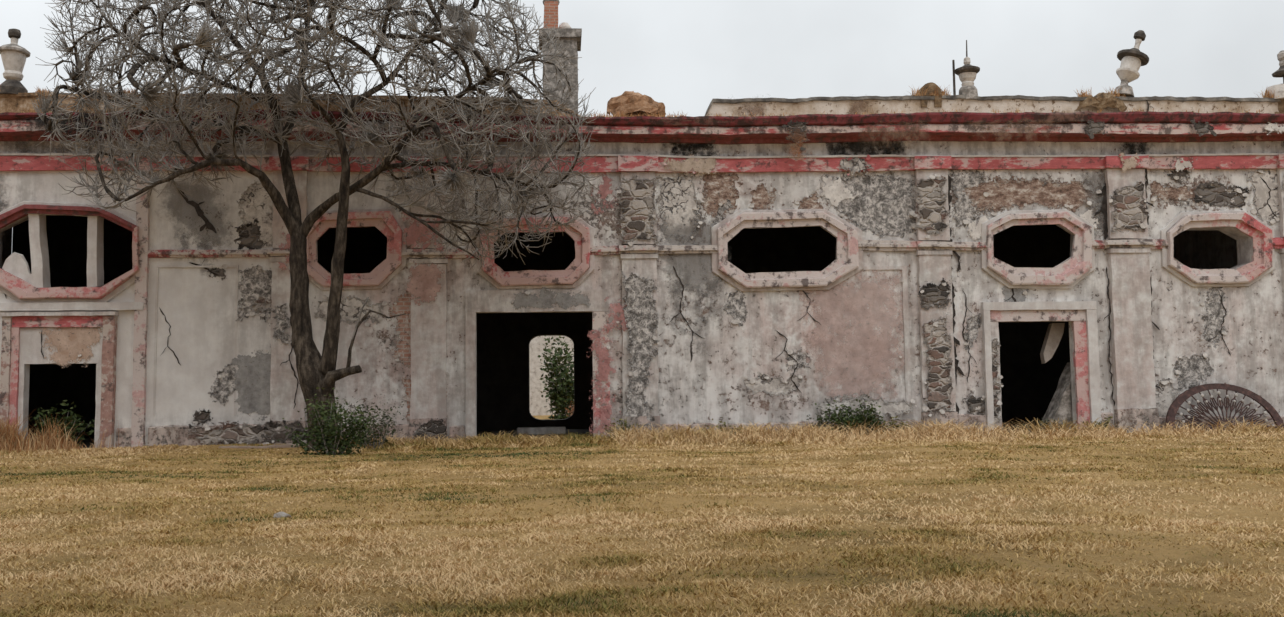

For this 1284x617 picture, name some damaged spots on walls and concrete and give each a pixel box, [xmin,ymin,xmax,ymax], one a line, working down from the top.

flaking render [1080,119,1109,139]
flaking render [591,155,776,246]
flaking render [792,152,1284,242]
peeling [39,327,103,367]
crack [159,307,181,365]
flaking render [178,180,308,445]
flaking render [744,347,812,396]
crack [774,290,821,392]
flaking render [815,278,1004,424]